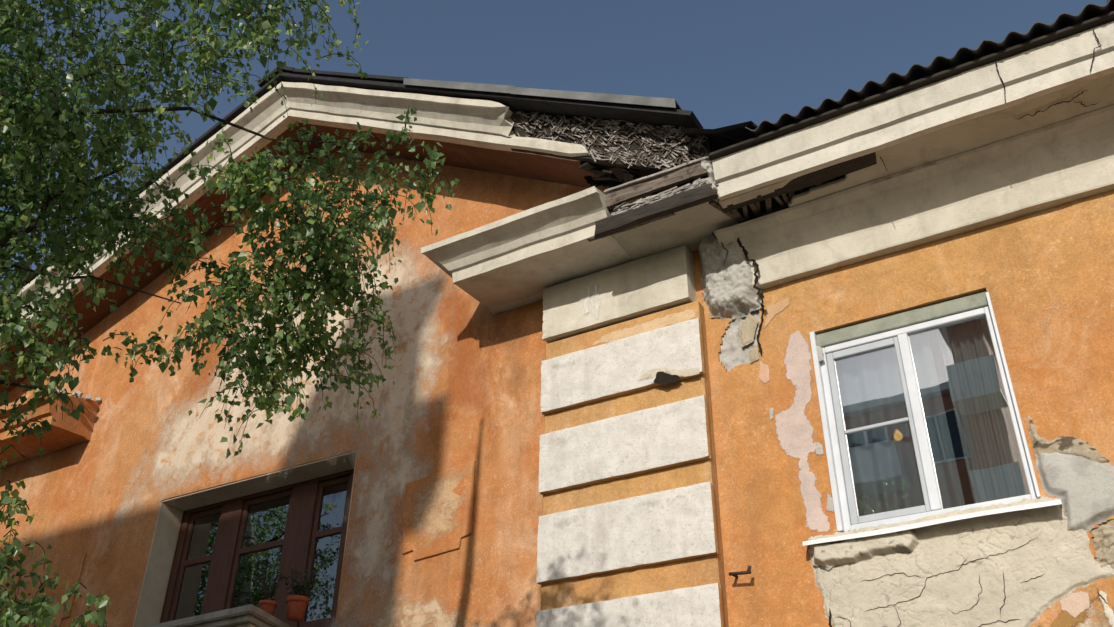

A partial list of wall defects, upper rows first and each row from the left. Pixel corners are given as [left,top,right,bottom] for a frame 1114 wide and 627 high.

crack [995,30,1102,120]
spalling [709,152,888,223]
flaking render [593,235,790,383]
crack [712,233,765,357]
spalling [638,368,700,386]
flaking render [769,331,1114,627]